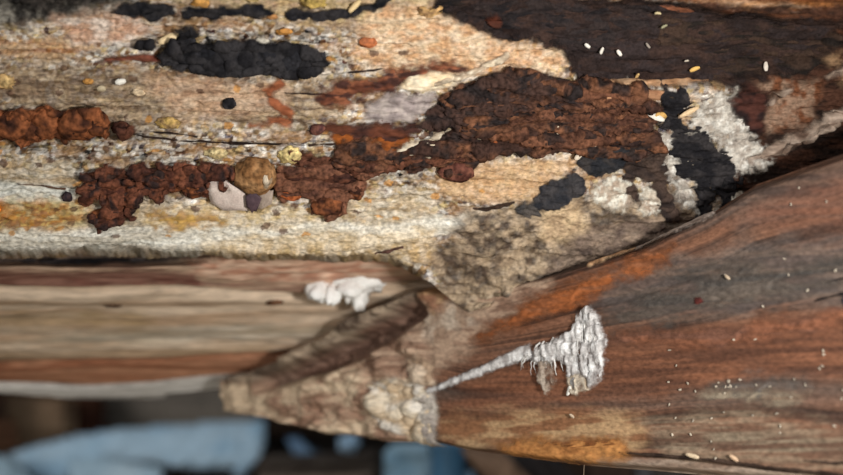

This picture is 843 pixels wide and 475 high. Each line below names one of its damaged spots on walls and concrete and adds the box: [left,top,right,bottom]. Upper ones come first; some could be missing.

water stain [285,0,391,22]
water stain [111,2,331,81]
corrosion [315,61,469,109]
corrosion [325,120,423,151]
water stain [405,0,843,266]
water stain [288,149,466,174]
corrosion [146,209,225,233]
water stain [0,256,189,265]
water stain [304,276,386,312]
water stain [426,305,607,395]